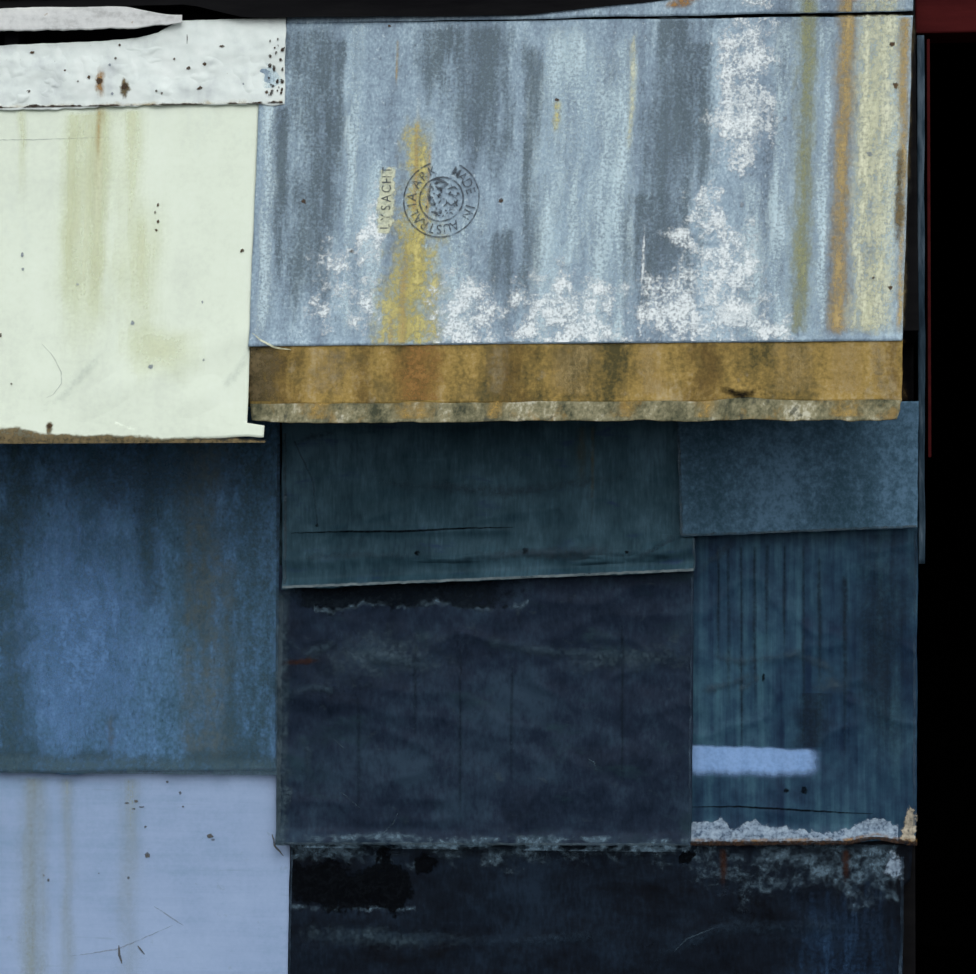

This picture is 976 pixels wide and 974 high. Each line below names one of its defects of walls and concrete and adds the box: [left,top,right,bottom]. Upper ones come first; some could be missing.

corrosion [0,57,132,131]
corrosion [248,0,908,418]
leakage [741,27,791,338]
leakage [814,28,833,330]
corrosion [0,423,265,444]
peeling [290,834,498,919]
peeling [517,837,566,851]